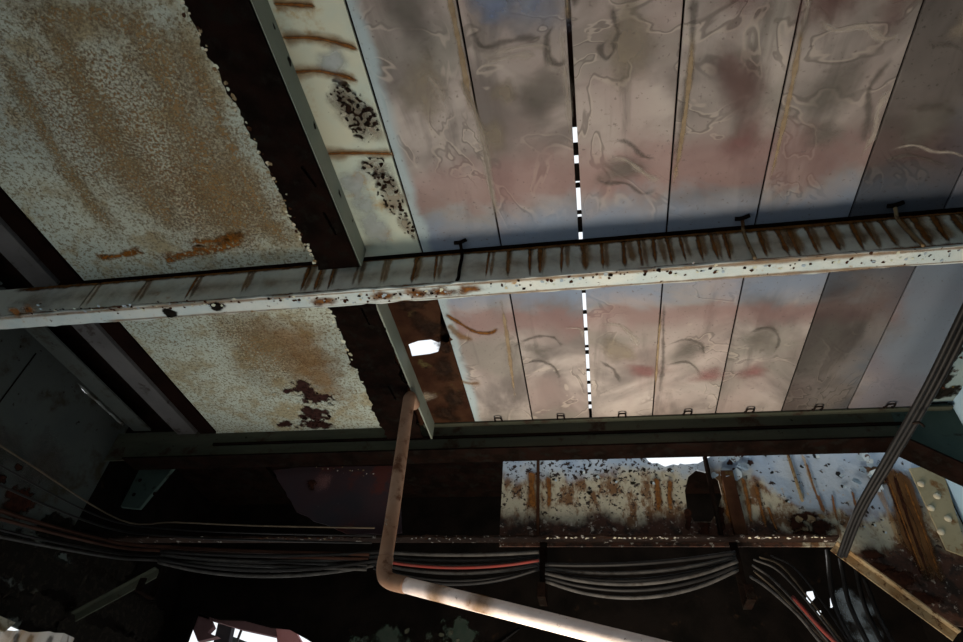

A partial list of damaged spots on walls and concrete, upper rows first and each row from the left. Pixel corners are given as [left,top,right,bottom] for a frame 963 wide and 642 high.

corrosion [274,0,314,9]
corrosion [273,24,356,50]
corrosion [287,56,356,81]
corrosion [0,3,291,263]
corrosion [327,150,391,158]
corrosion [0,211,963,429]
corrosion [528,472,552,509]
corrosion [653,478,731,535]
corrosion [741,478,777,530]
corrosion [786,455,838,543]
corrosion [861,468,945,604]